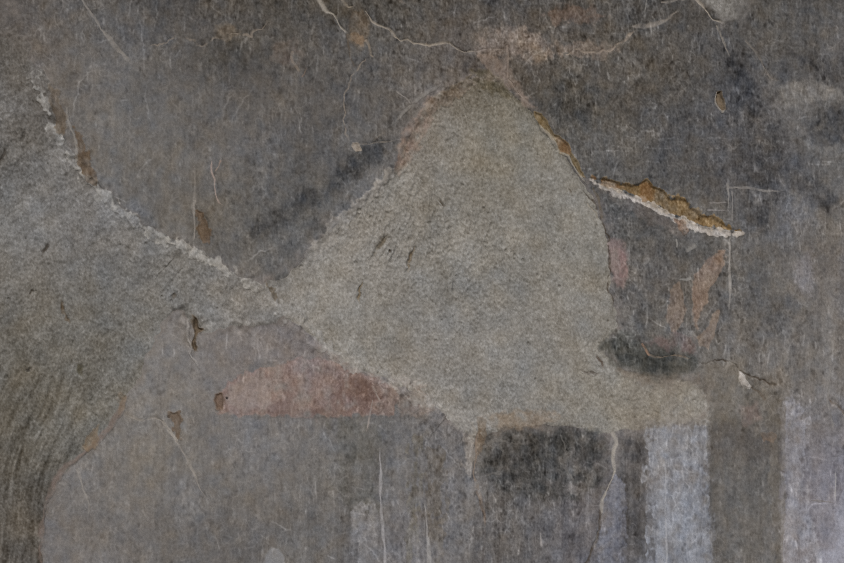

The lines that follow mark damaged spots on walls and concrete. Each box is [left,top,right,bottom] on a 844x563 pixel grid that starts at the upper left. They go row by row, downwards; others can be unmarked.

crack [315,0,529,144]
peeling [329,132,400,220]
spalling [533,111,746,241]
spalling [369,235,392,258]
crack [583,430,619,563]